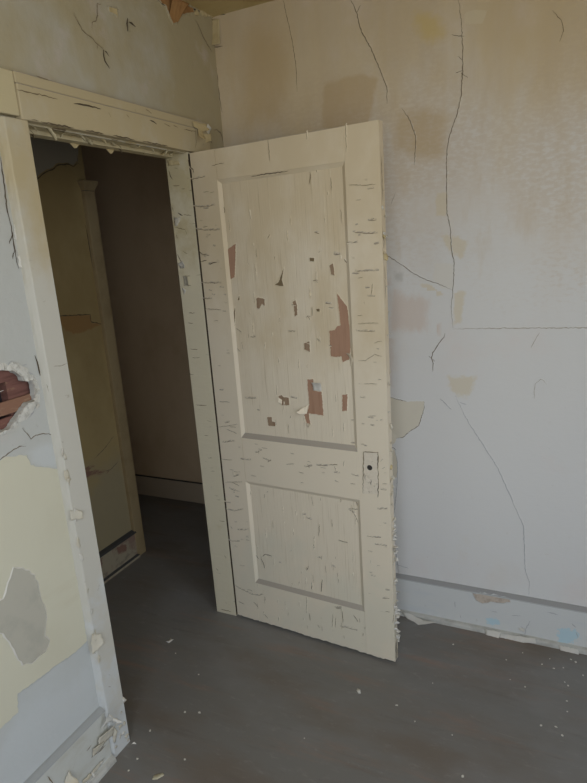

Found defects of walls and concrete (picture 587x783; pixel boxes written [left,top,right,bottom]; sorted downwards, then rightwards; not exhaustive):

crack [73,3,110,69]
crack [37,161,79,180]
crack [36,120,167,146]
crack [252,140,288,178]
crack [146,109,231,324]
flaking render [59,310,102,338]
spalling [0,362,40,437]
flaking render [84,461,111,481]
crack [199,386,425,645]
peeling [0,567,50,666]
peeling [482,615,536,643]
peeling [0,629,105,783]